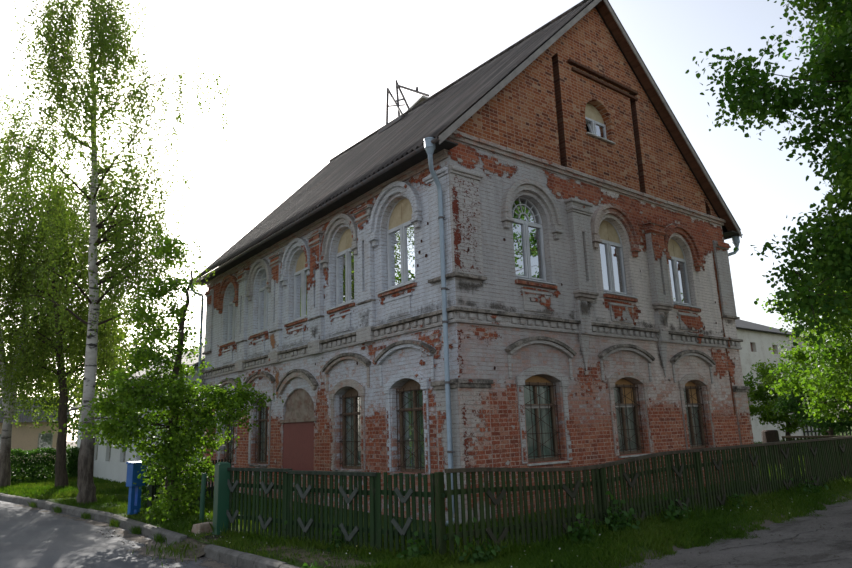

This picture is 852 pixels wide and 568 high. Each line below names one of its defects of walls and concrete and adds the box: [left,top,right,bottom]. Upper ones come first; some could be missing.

peeling [447,134,517,179]
peeling [301,222,329,299]
spalling [452,175,481,273]
peeling [543,161,730,271]
peeling [314,382,335,494]
peeling [361,336,391,365]
peeling [360,406,394,503]
peeling [408,315,502,506]
peeling [461,381,529,511]
peeling [568,361,608,403]
peeling [566,410,620,497]
peeling [603,298,641,325]